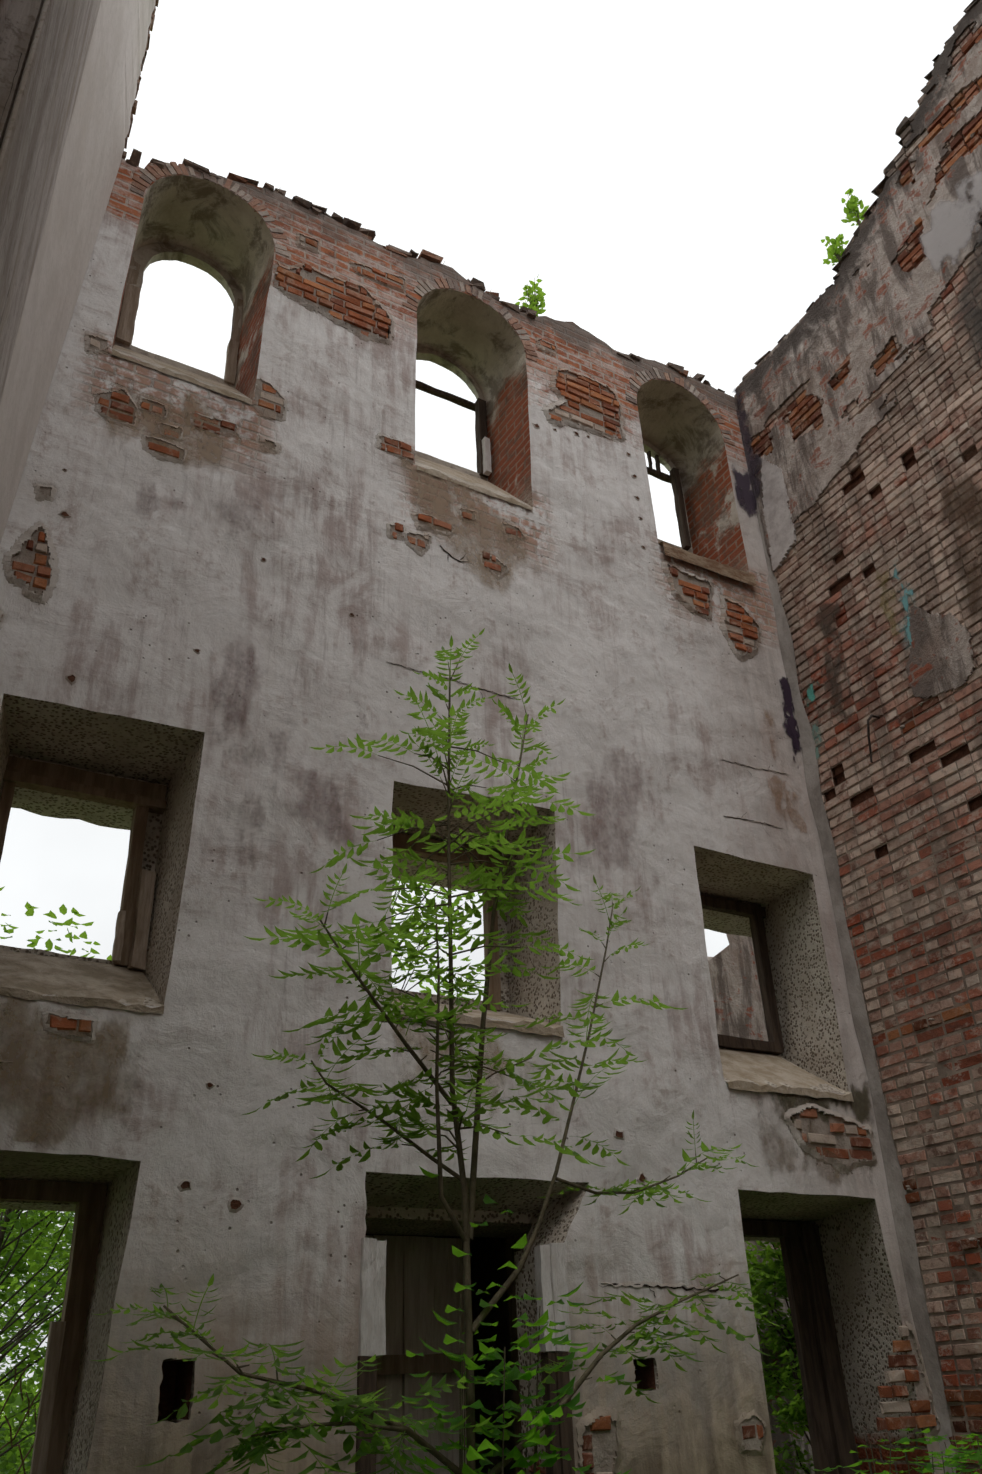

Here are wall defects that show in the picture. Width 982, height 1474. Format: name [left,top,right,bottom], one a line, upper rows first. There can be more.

water stain [921,172,982,361]
flaking render [92,387,241,465]
flaking render [251,377,289,454]
flaking render [2,468,72,605]
flaking render [386,506,479,556]
flaking render [477,521,526,580]
water stain [943,478,982,613]
flaking render [661,561,762,662]
water stain [0,997,125,1143]
flaking render [783,1103,878,1175]